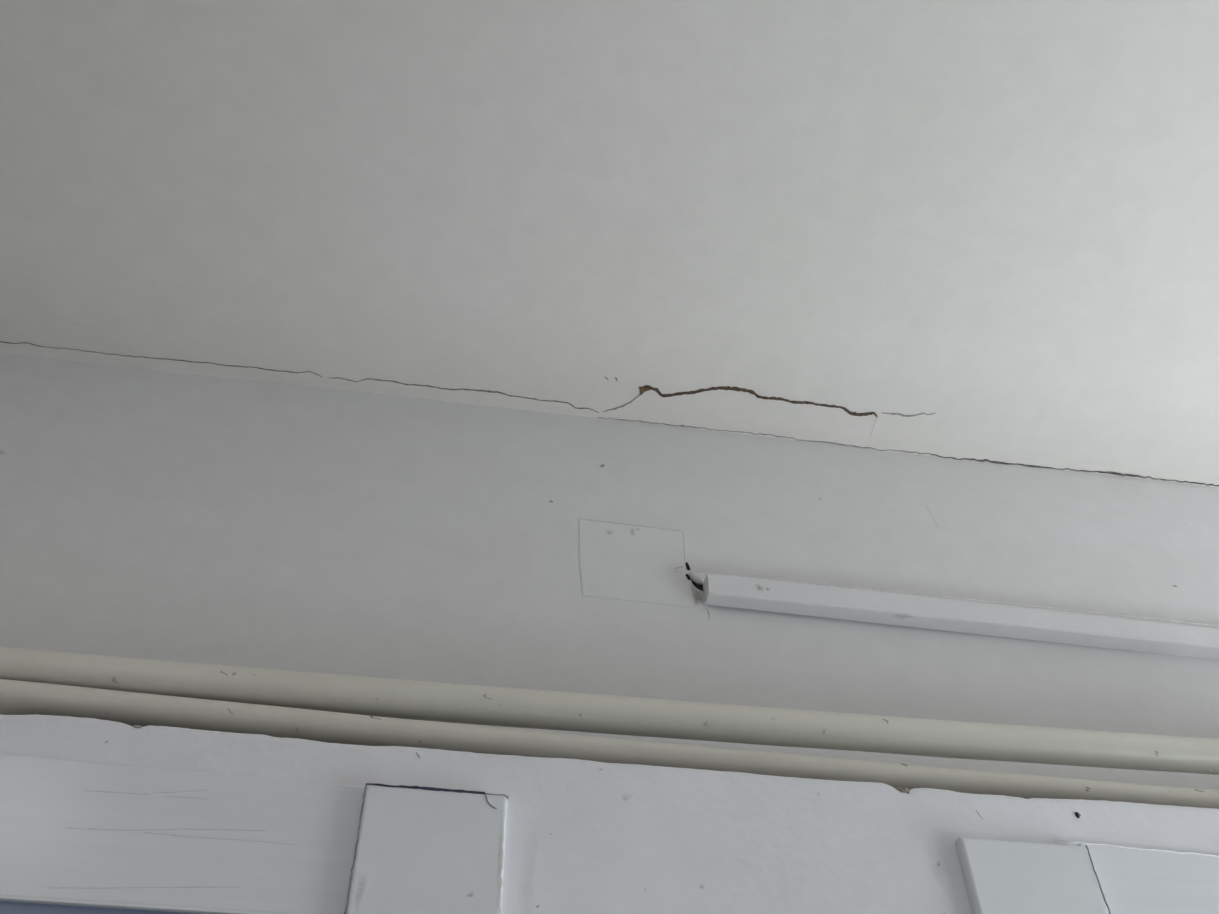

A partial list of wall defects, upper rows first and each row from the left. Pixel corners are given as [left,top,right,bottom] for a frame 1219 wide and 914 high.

crack [0,341,1219,486]